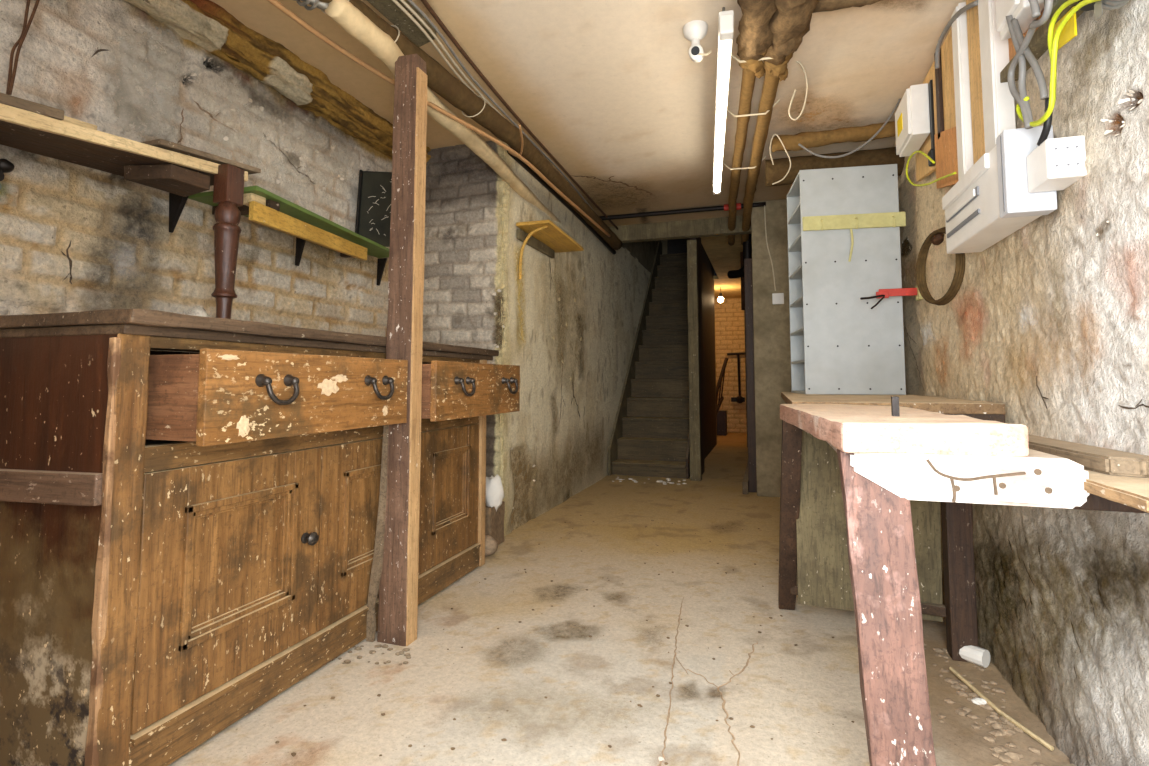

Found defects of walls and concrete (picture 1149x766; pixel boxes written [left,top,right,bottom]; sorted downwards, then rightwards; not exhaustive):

crack [658,598,758,766]